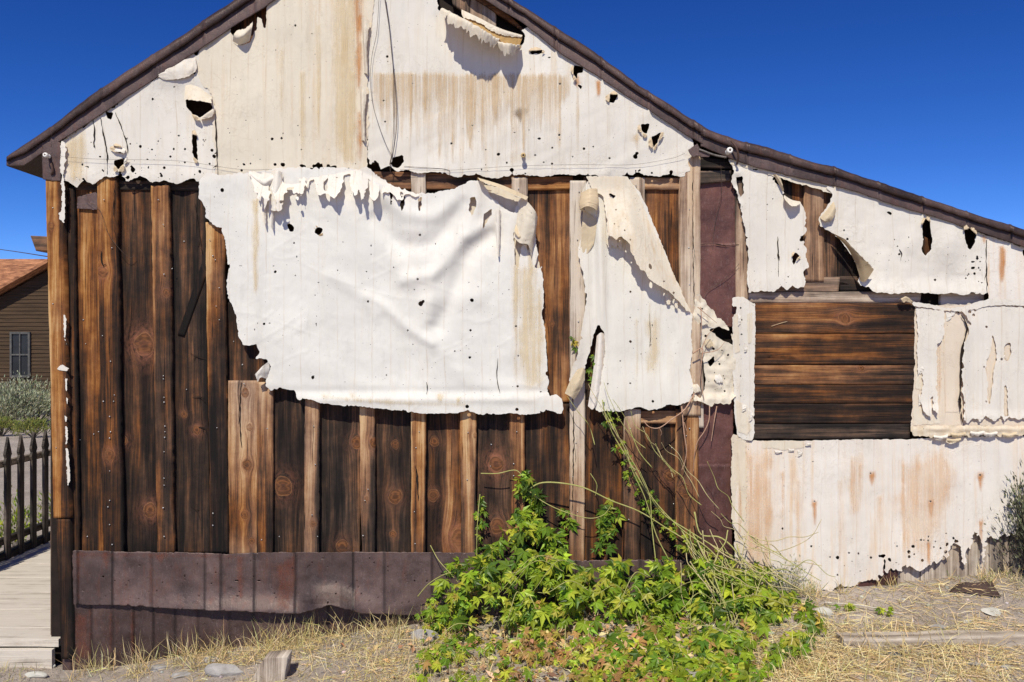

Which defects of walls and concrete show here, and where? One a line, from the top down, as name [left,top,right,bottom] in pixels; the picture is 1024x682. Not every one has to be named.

peeling [192,109,214,135]
peeling [733,312,753,353]
peeling [913,306,1024,426]
peeling [736,401,753,435]